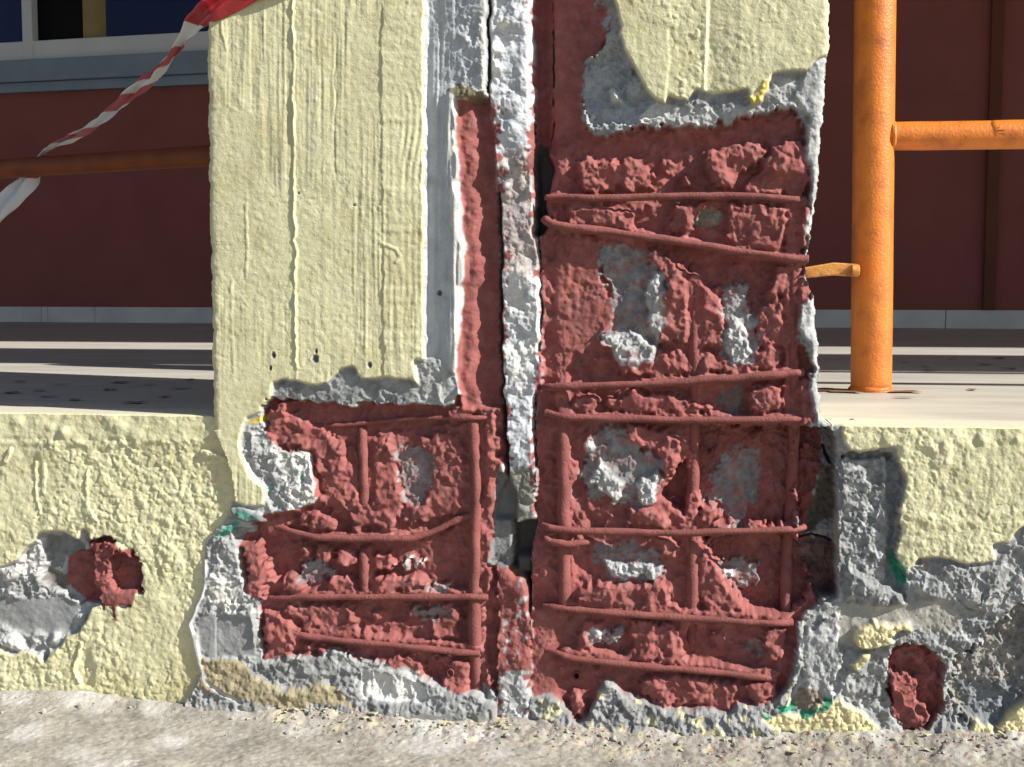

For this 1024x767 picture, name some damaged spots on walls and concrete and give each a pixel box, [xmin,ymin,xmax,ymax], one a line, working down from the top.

spalling [0,529,145,661]
spalling [184,0,510,724]
spalling [530,0,1024,739]